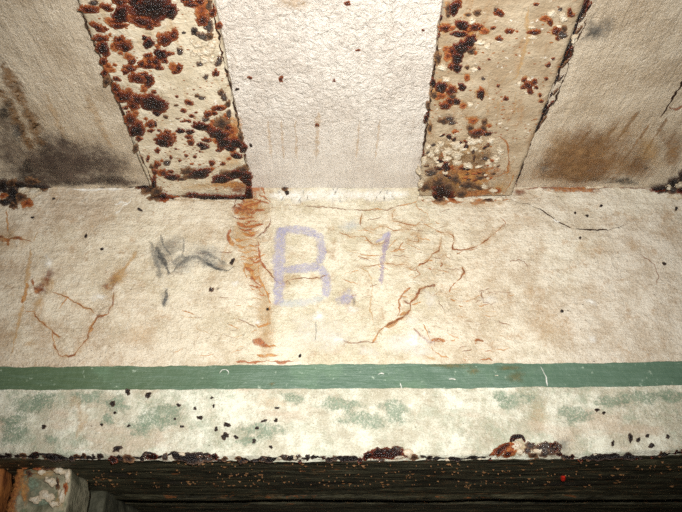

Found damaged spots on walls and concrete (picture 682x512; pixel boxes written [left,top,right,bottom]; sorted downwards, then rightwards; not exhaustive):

leakage [0,66,136,191]
corrosion [77,0,271,328]
crack [308,14,512,359]
corrosion [417,0,575,205]
crack [484,0,645,231]
leakage [546,113,667,183]
crack [26,292,114,358]
corrosion [236,338,291,364]